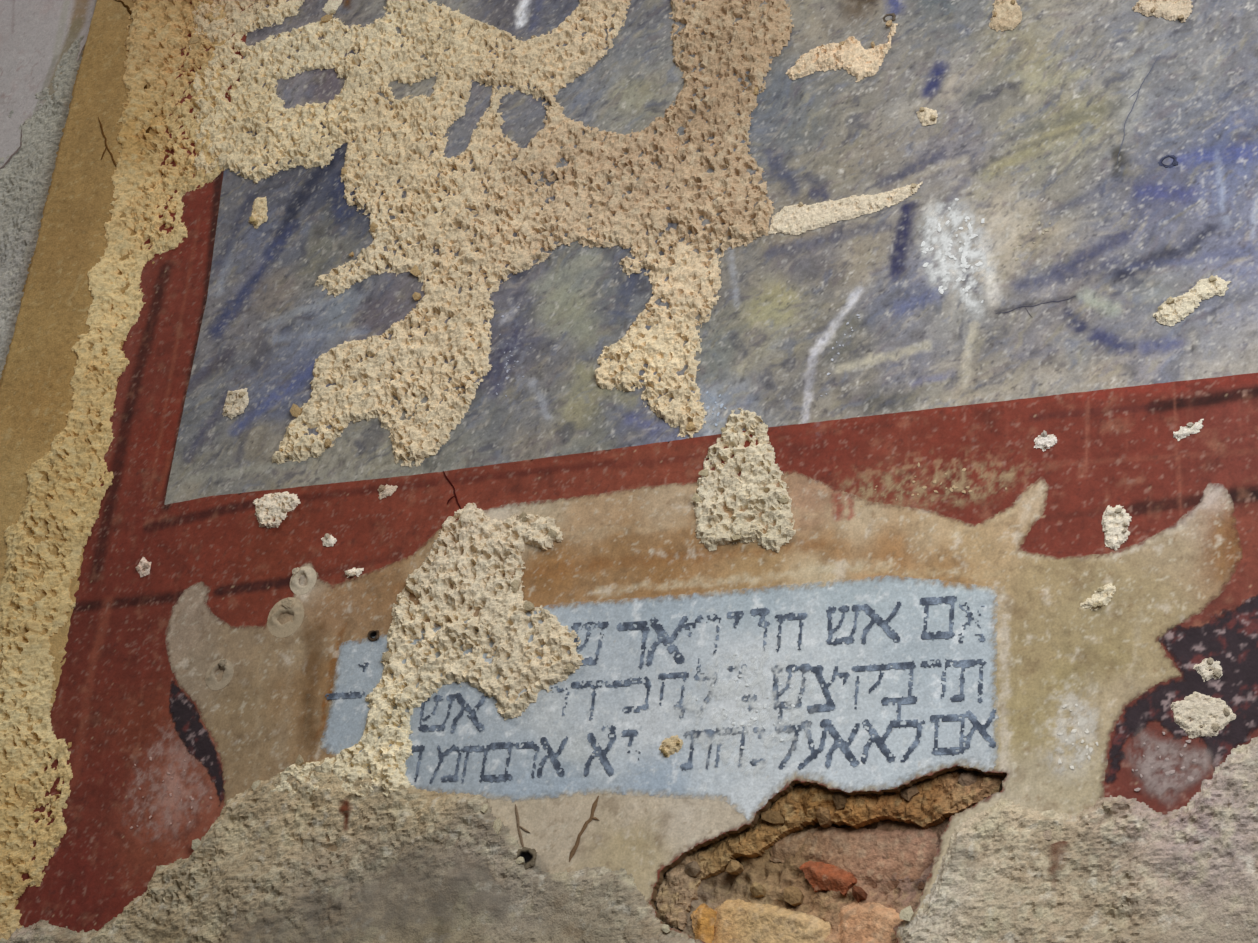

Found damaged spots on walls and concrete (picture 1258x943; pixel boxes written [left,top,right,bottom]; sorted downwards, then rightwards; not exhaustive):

crack [0,124,24,169]
flaking render [0,0,923,940]
flaking render [0,503,1258,943]